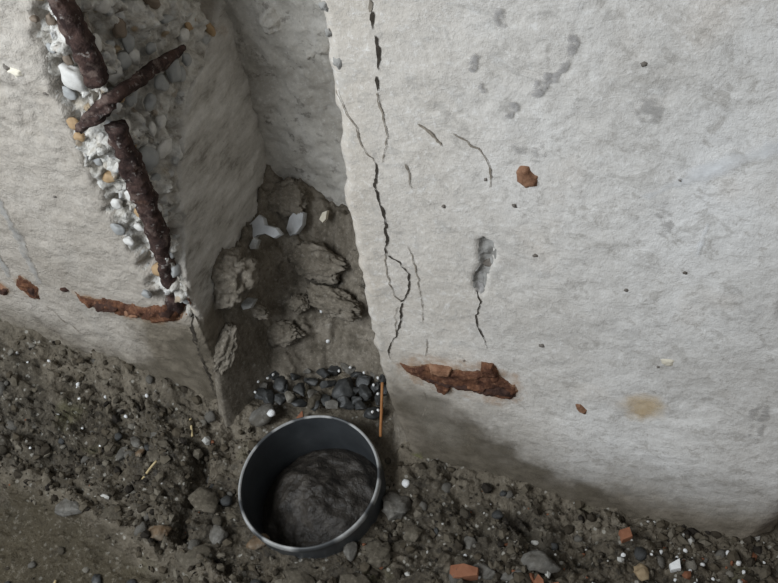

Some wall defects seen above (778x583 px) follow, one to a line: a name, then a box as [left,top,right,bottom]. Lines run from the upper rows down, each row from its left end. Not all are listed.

spalling [29,0,216,317]
crack [336,0,428,358]
crack [418,124,492,188]
rust [516,166,538,188]
flaking render [249,212,307,249]
rust [0,275,40,299]
rust [60,287,191,323]
crack [475,290,486,345]
rust [400,361,518,400]